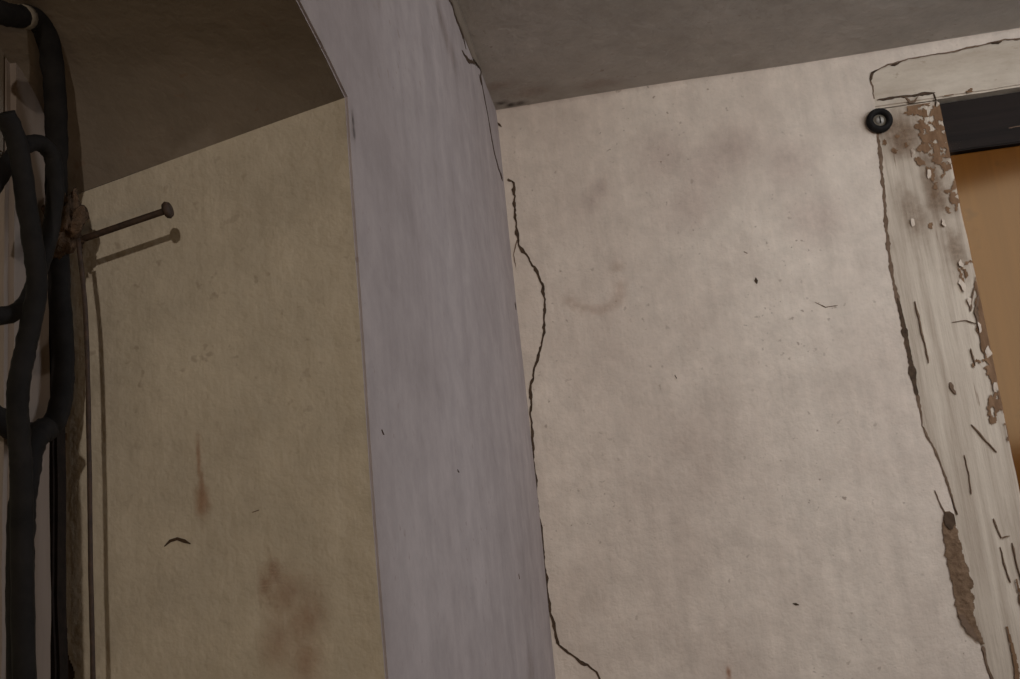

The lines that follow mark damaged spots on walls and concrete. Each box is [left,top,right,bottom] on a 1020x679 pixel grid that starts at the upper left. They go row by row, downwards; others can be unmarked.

peeling [882,94,960,229]
crack [449,0,546,486]
peeling [952,243,1010,441]
crack [539,510,601,679]
flaking render [942,511,985,644]
peeling [993,518,1020,603]
peeling [1006,626,1020,679]